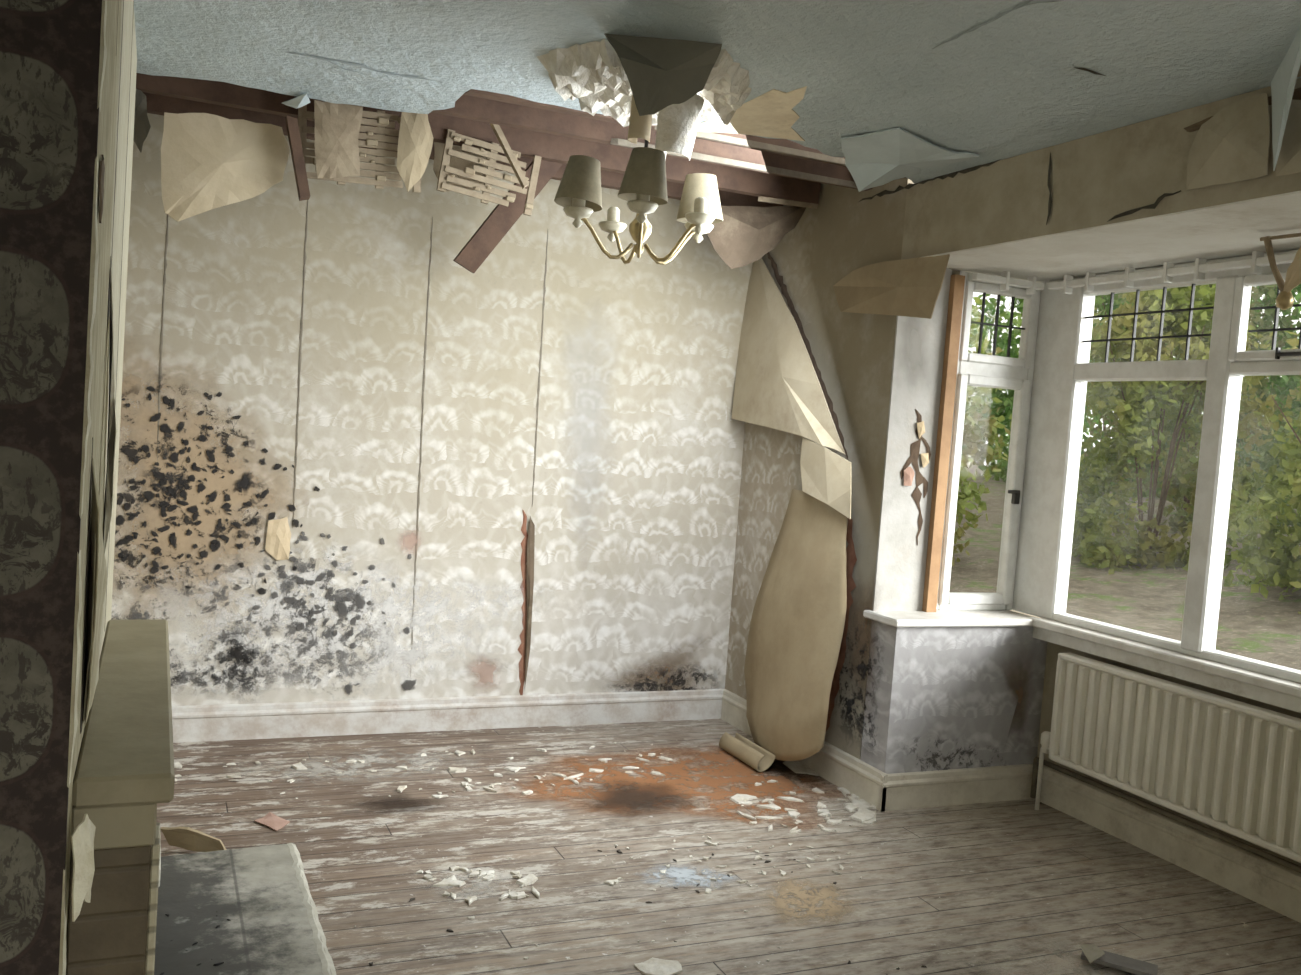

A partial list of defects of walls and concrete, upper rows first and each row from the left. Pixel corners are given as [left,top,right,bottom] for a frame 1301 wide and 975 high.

crack [932,0,1064,49]
peeling [697,86,807,141]
water stain [115,372,450,694]
water stain [1010,670,1028,726]
water stain [912,741,990,770]